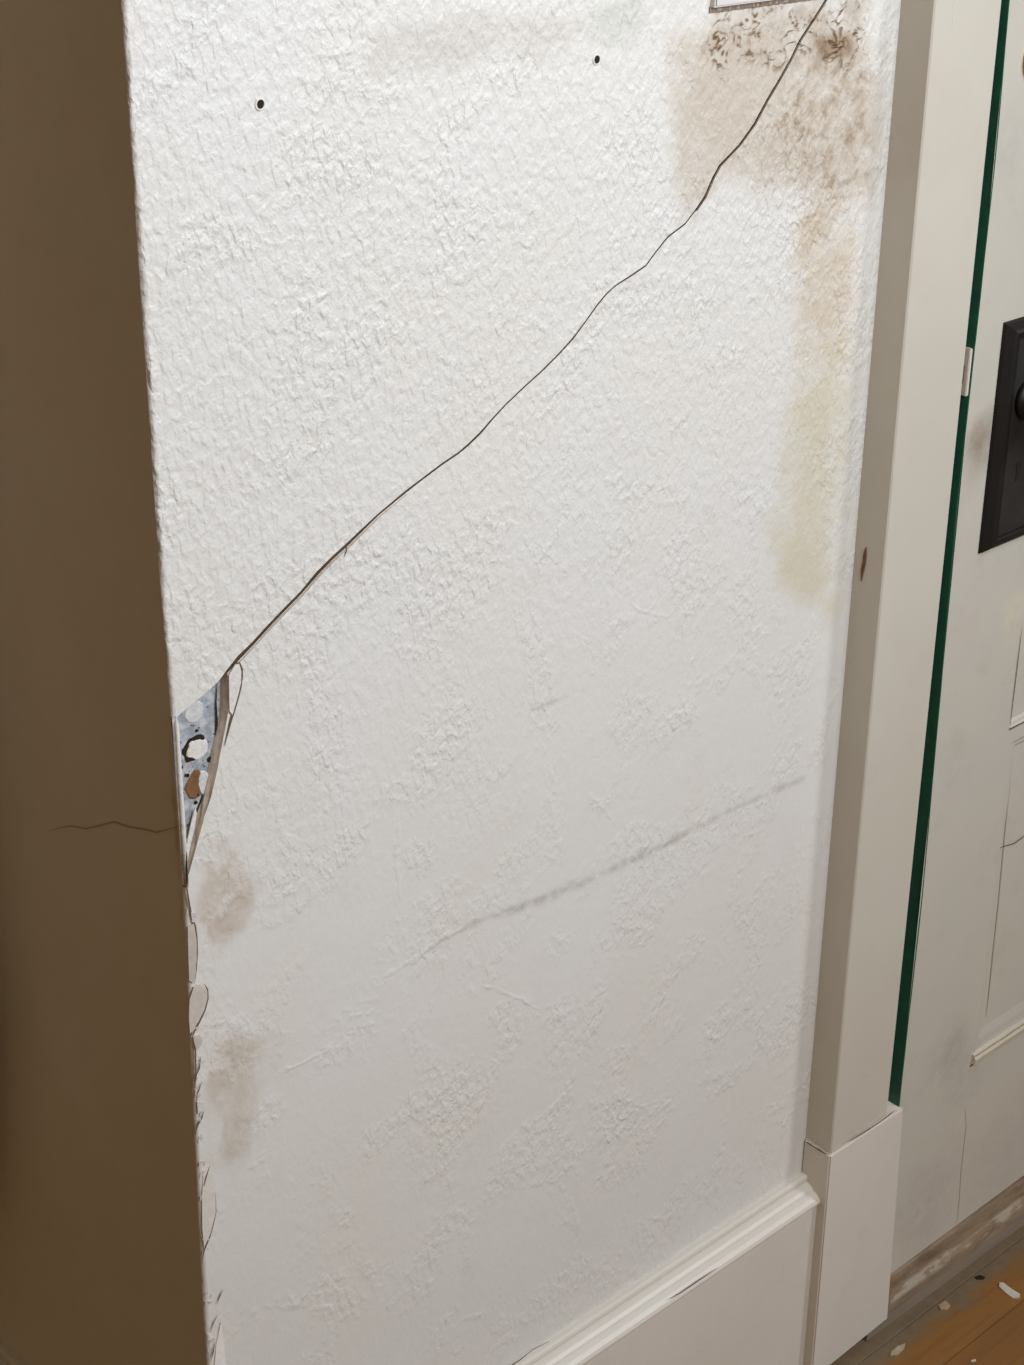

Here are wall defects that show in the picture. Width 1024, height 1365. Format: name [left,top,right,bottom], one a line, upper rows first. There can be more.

water stain [713,14,760,68]
water stain [825,4,861,62]
crack [224,0,827,746]
flaking render [172,664,241,1143]
peeling [198,1160,227,1365]